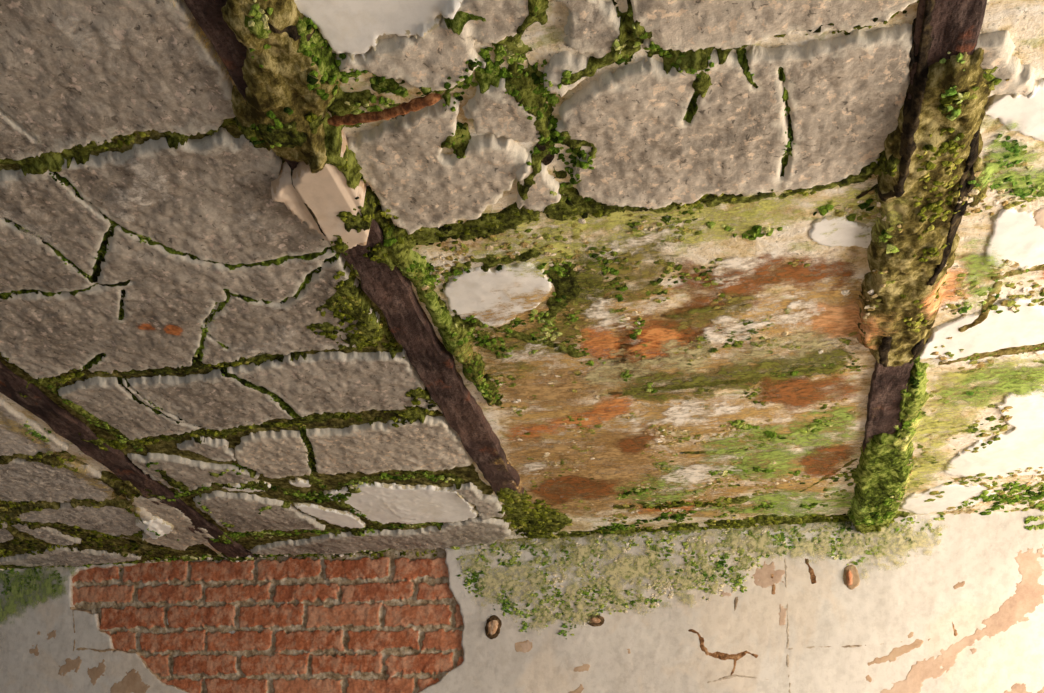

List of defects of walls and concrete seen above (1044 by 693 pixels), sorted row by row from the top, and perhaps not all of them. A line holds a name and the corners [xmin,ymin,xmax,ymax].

crack [268,23,328,56]
crack [683,90,700,123]
crack [736,48,795,177]
crack [0,165,348,474]
rust [580,255,852,364]
rust [796,301,878,348]
rust [758,376,858,410]
rust [533,475,618,506]
flaking render [70,548,464,693]
peeling [778,604,788,626]
peeling [865,544,1044,693]
peeling [58,656,106,686]